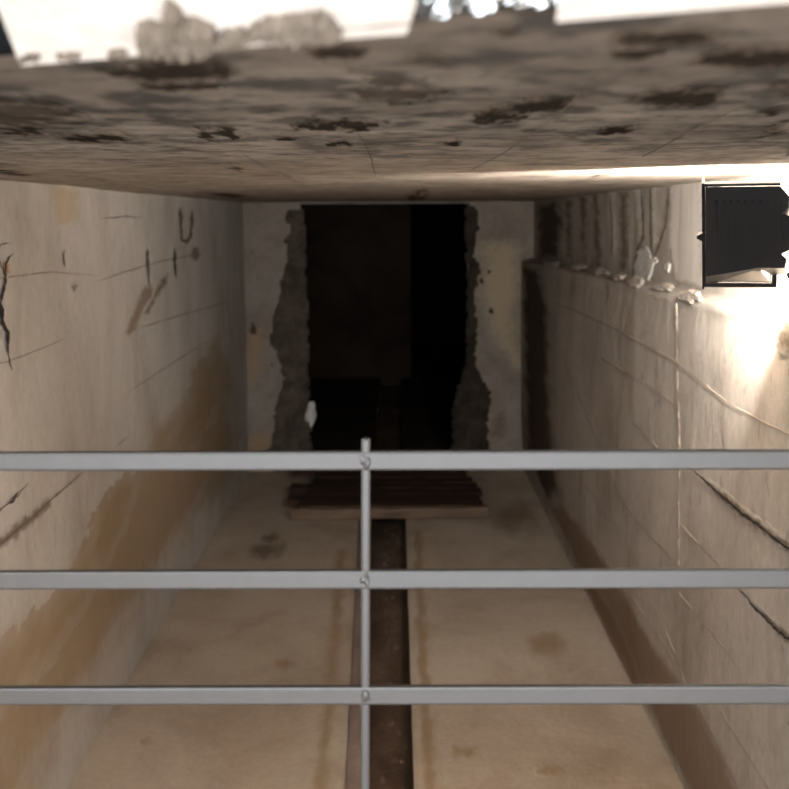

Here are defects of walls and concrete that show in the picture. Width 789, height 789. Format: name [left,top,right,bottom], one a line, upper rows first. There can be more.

water stain [609,45,669,61]
water stain [595,124,645,136]
crack [0,243,13,370]
flaking render [265,209,312,451]
flaking render [450,202,491,450]
water stain [115,317,275,451]
crack [0,473,82,552]
water stain [50,471,274,570]
crack [693,470,789,556]
water stain [0,589,162,686]
crack [739,589,789,648]
water stain [0,705,104,789]